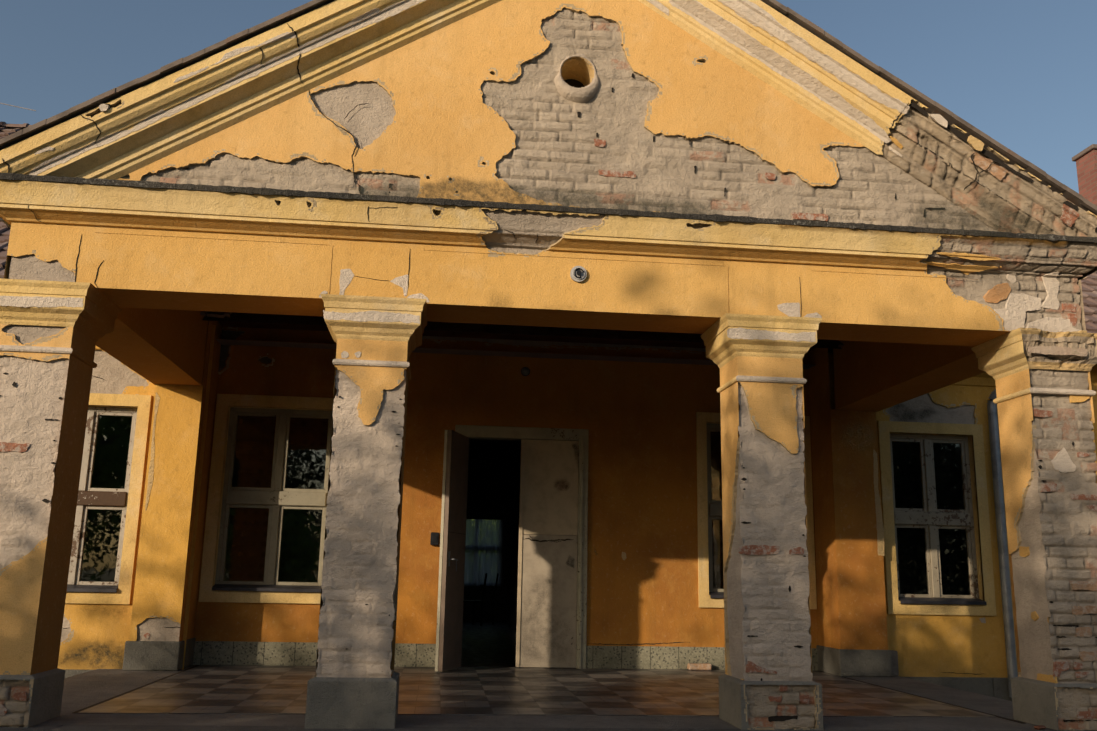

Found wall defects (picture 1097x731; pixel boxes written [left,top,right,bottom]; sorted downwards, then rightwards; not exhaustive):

peeling [29,0,426,175]
flaking render [121,153,430,205]
crack [287,23,368,176]
flaking render [481,0,1097,332]
crack [964,153,994,190]
flaking render [3,324,66,345]
peeling [319,269,420,324]
flaking render [0,356,69,570]
flaking render [90,350,160,511]
flaking render [316,351,406,678]
flaking render [727,383,816,729]
flaking render [1011,369,1097,730]